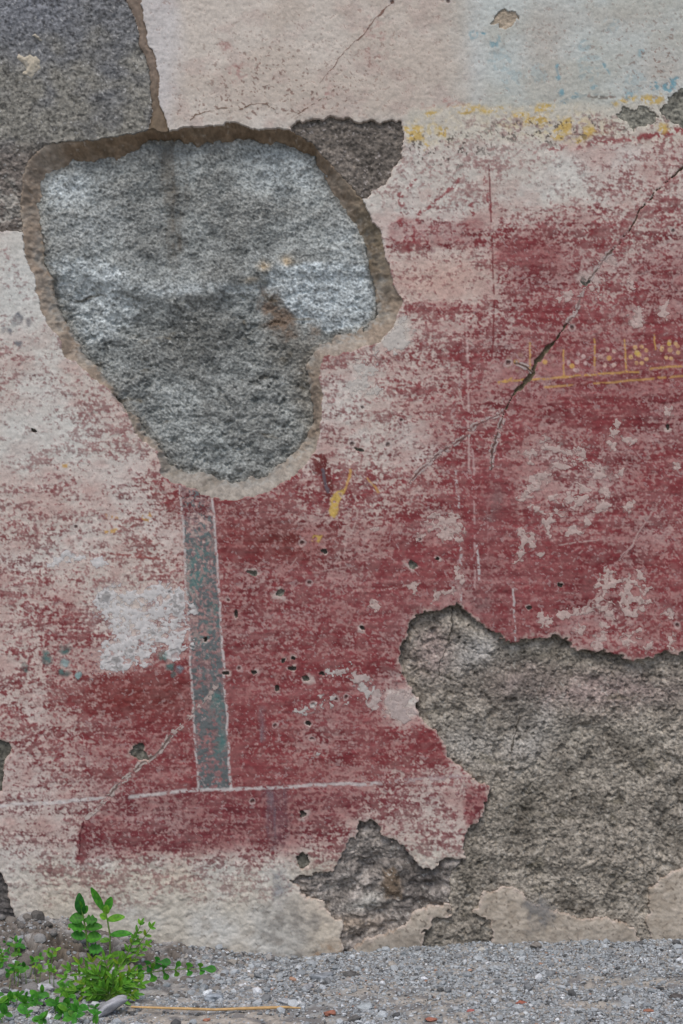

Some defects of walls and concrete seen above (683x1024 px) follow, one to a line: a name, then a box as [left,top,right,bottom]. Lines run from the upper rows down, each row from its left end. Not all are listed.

spalling [0,0,415,501]
crack [190,1,393,120]
crack [409,167,683,484]
spalling [616,89,683,132]
peeling [415,512,465,542]
spalling [282,565,683,951]